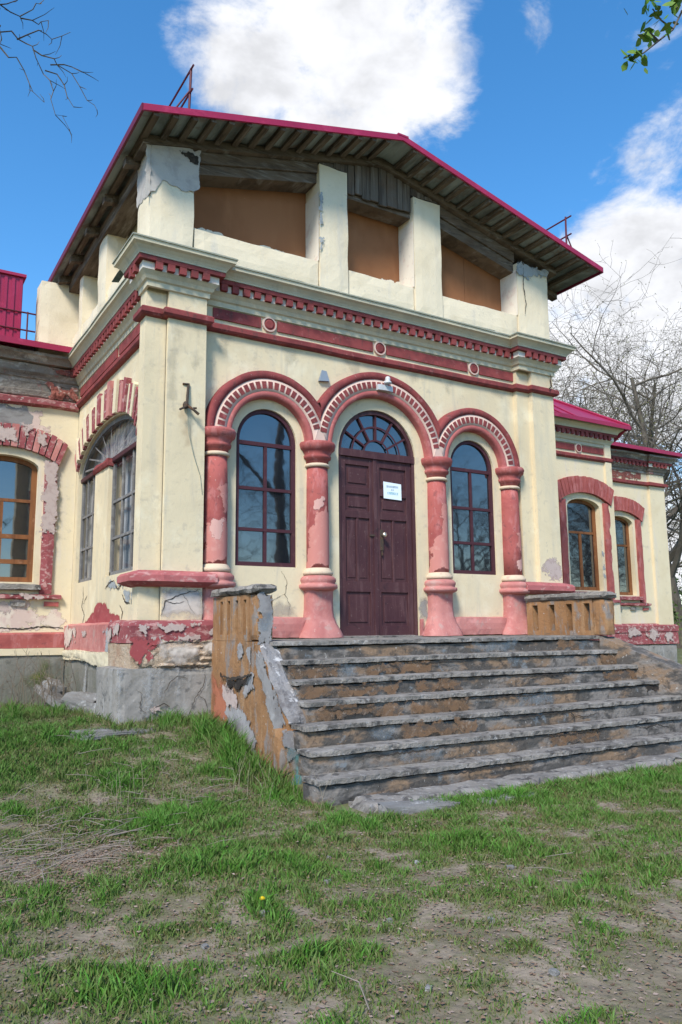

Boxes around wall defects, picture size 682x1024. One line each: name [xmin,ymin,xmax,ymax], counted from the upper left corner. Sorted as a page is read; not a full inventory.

spalling [179,150,199,165]
flaking render [0,403,51,446]
peeling [39,460,59,538]
peeling [203,483,228,563]
peeling [306,496,329,568]
peeling [429,503,449,573]
peeling [0,593,86,647]
crack [136,641,211,713]
spalling [102,579,297,762]
peeling [628,627,674,643]